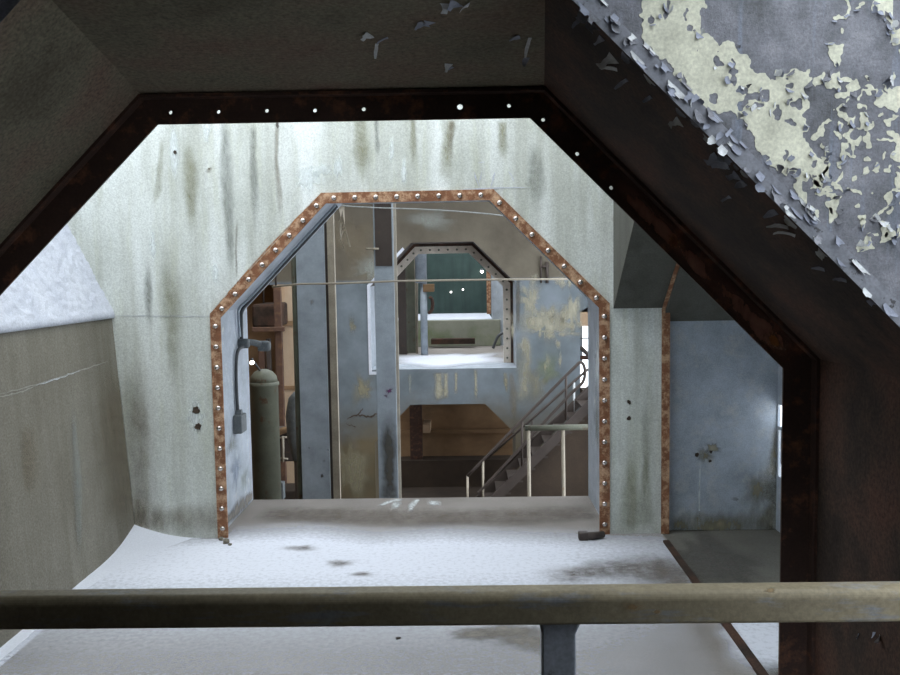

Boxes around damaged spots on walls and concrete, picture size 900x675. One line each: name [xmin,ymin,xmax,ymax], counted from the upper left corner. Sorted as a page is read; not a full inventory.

peeling [360,32,388,59]
peeling [414,0,470,30]
peeling [571,0,900,283]
water stain [224,184,232,249]
corrosion [222,208,307,300]
peeling [863,287,898,317]
peeling [520,276,580,397]
crack [0,362,105,397]
corrosion [383,427,396,498]
water stain [270,499,590,522]